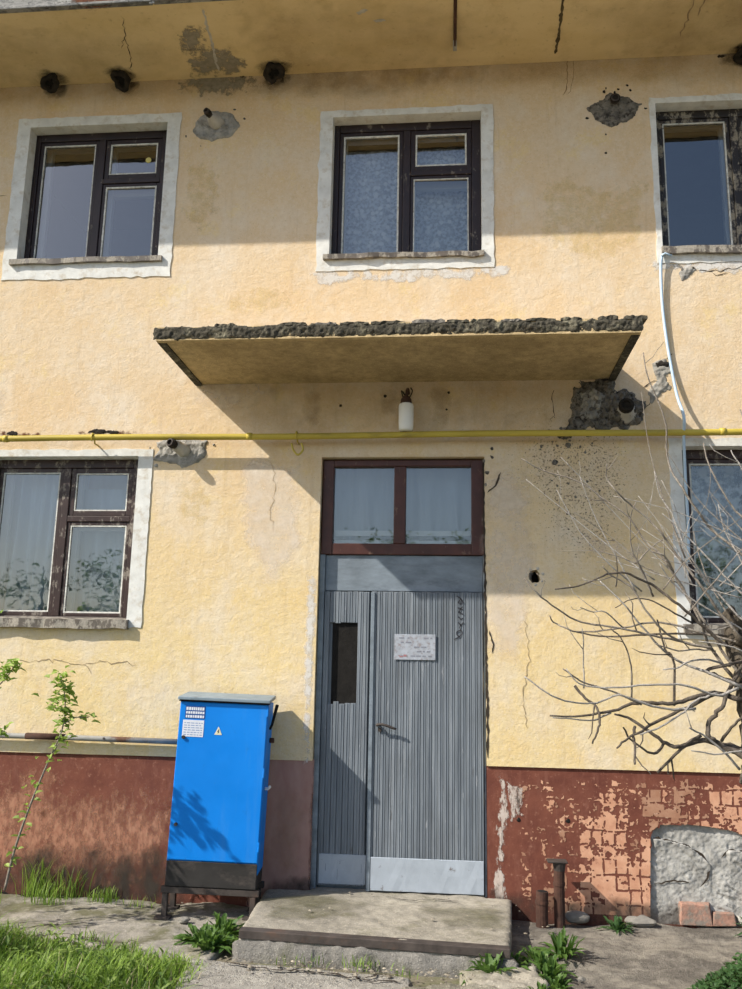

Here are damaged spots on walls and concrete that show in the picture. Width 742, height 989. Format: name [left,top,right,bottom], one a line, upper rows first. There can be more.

spalling [679,267,696,281]
spalling [153,315,648,341]
spalling [548,359,671,448]
crack [21,659,136,671]
crack [523,621,531,727]
peeling [493,779,742,927]